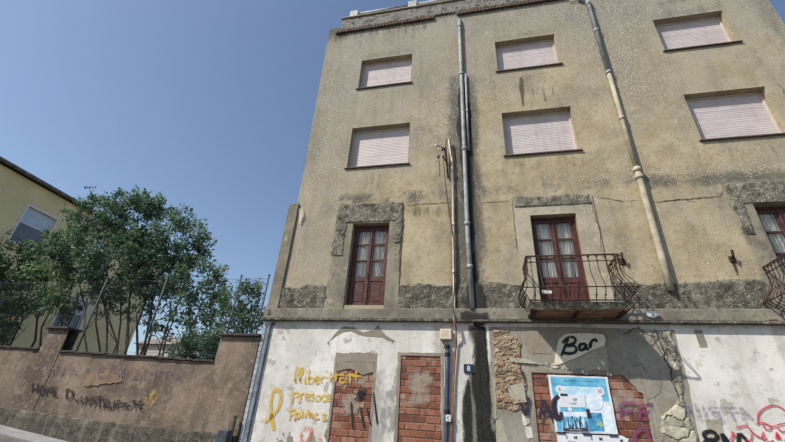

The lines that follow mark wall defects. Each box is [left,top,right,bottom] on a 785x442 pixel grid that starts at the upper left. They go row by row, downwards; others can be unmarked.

crack [659,190,724,203]
damp [456,87,497,442]
peeling [327,324,395,345]
peeling [489,326,700,442]